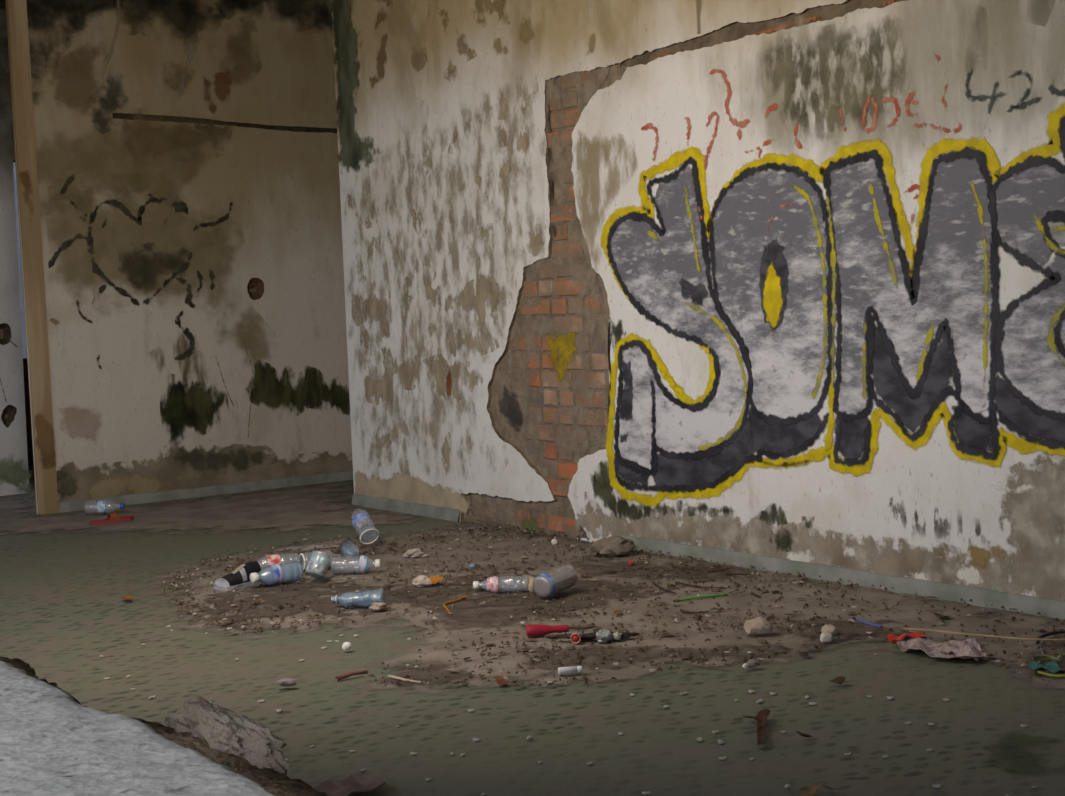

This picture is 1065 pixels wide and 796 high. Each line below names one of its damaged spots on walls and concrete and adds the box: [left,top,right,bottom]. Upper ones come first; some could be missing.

leakage [448,36,475,76]
leakage [475,0,534,42]
leakage [20,0,390,299]
spalling [347,65,627,539]
leakage [576,452,1065,601]